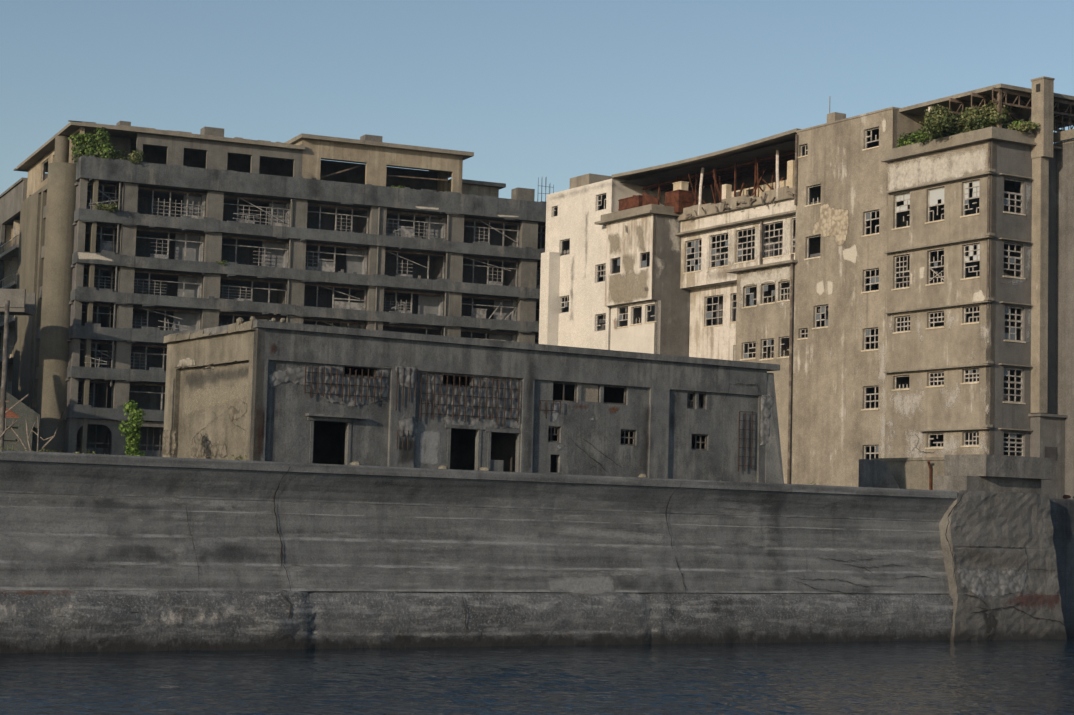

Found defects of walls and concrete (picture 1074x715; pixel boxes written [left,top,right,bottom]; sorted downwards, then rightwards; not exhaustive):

peeling [812,204,857,263]
crack [274,467,291,649]